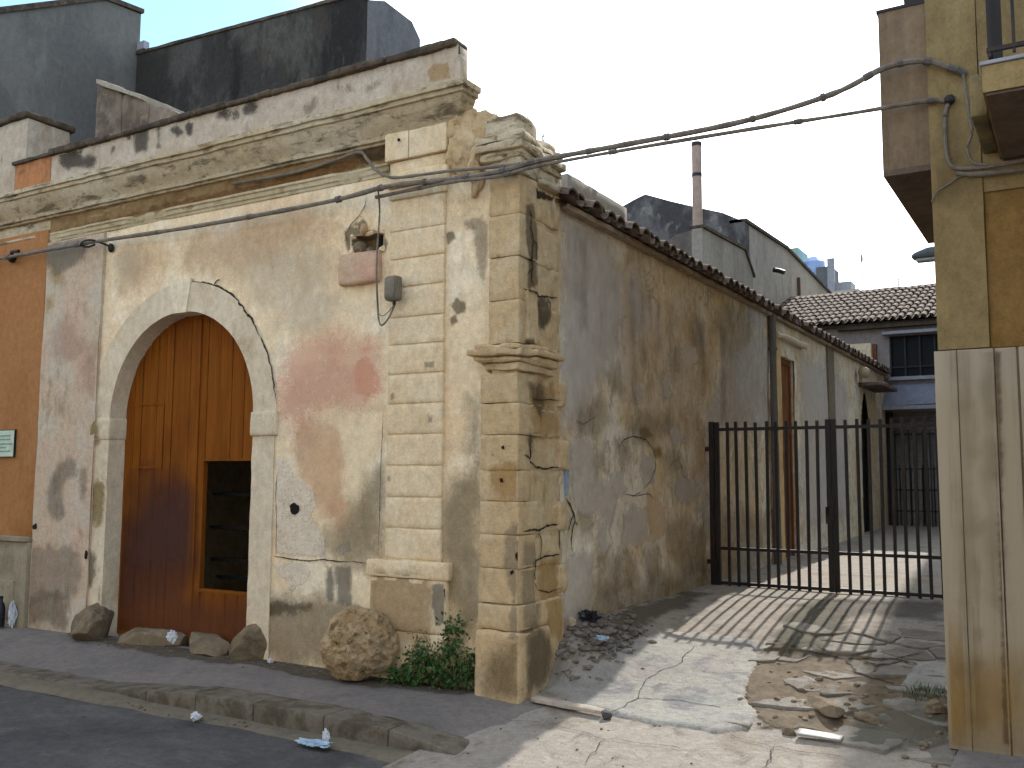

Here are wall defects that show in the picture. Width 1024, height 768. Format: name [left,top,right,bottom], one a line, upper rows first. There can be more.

damp [60,149,95,169]
spalling [445,108,499,199]
peeling [349,223,386,253]
crack [192,279,276,400]
damp [537,298,551,328]
crack [525,439,561,470]
spalling [275,457,351,592]
crack [524,498,577,593]
crack [610,429,688,575]
crack [613,646,718,711]